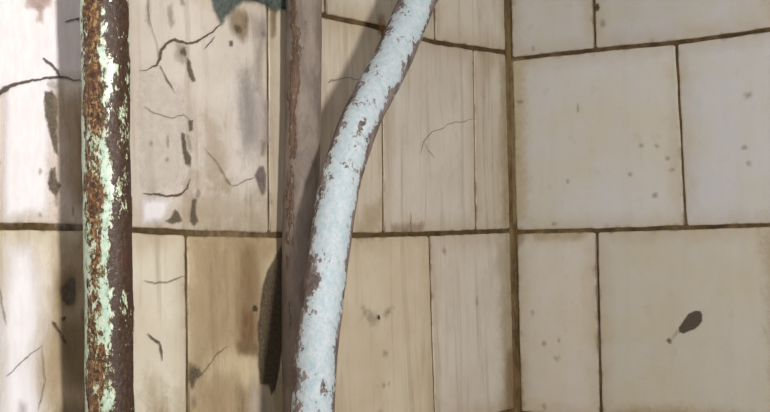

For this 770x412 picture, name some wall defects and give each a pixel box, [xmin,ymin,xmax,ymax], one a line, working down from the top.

peeling [213,0,286,35]
crack [0,58,82,95]
crack [140,24,221,92]
rust [283,0,307,245]
crack [144,179,191,197]
peeling [291,0,438,412]